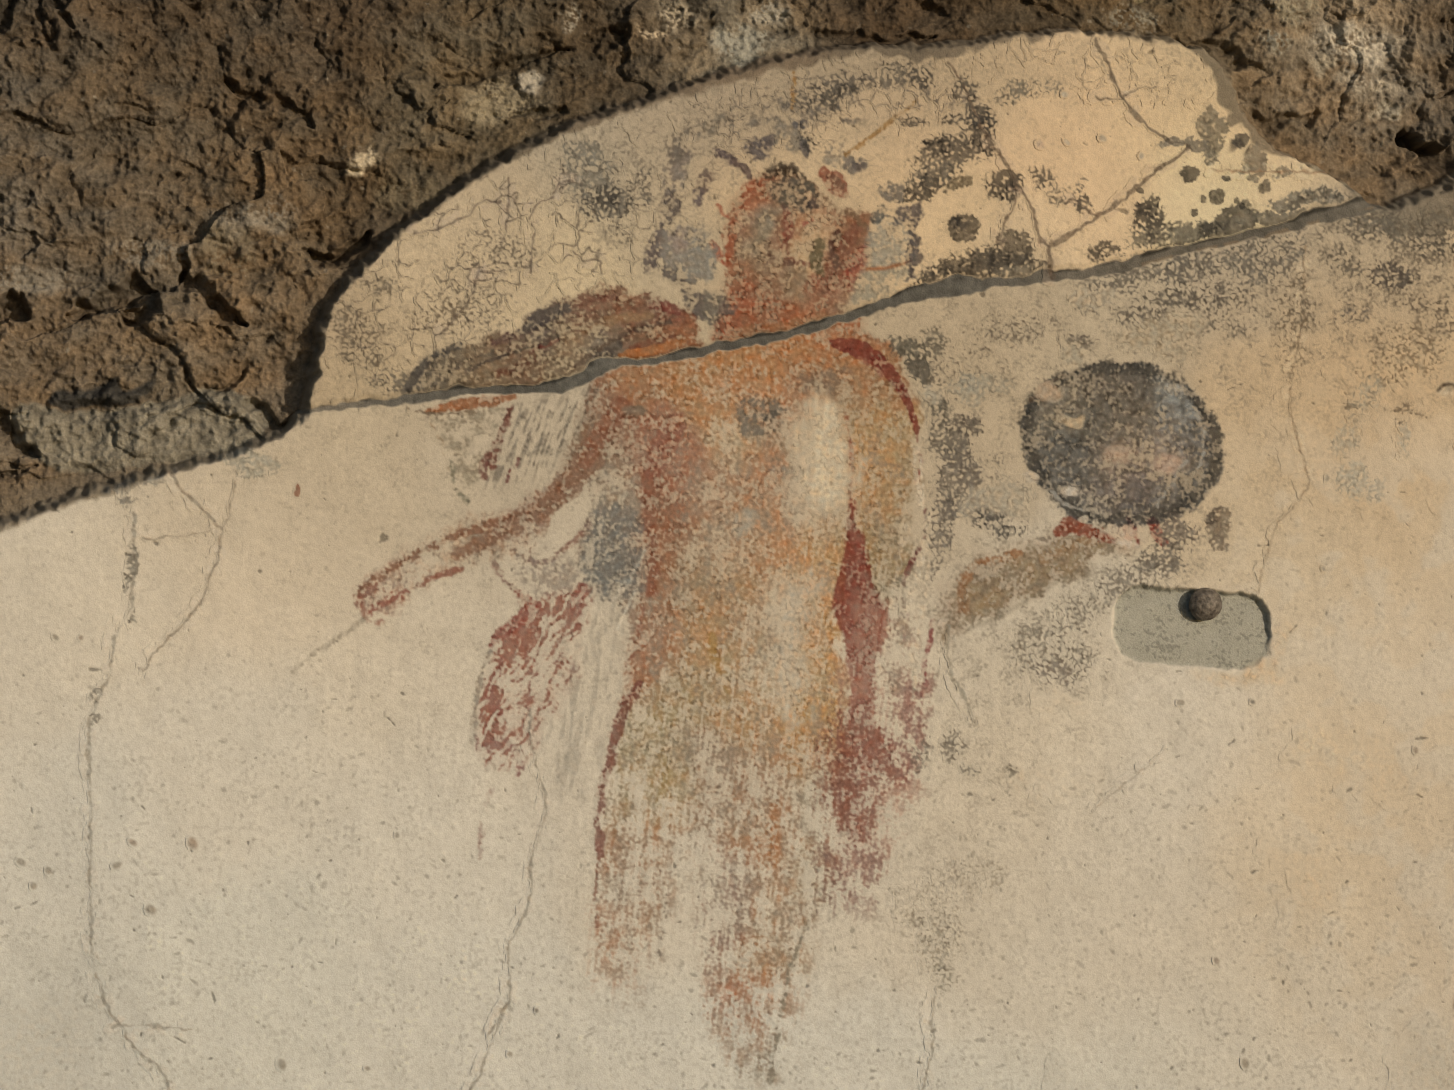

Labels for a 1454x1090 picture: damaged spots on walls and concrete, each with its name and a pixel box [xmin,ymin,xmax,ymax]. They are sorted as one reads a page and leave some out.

water stain [777,55,1094,216]
spalling [0,289,32,325]
spalling [65,272,161,327]
spalling [178,269,250,327]
spalling [301,230,373,270]
crack [315,31,1328,416]
water stain [878,102,1454,527]
crack [1252,239,1317,596]
peeling [121,539,141,631]
spalling [1113,587,1270,671]
crack [78,466,244,1090]
crack [462,705,555,1090]